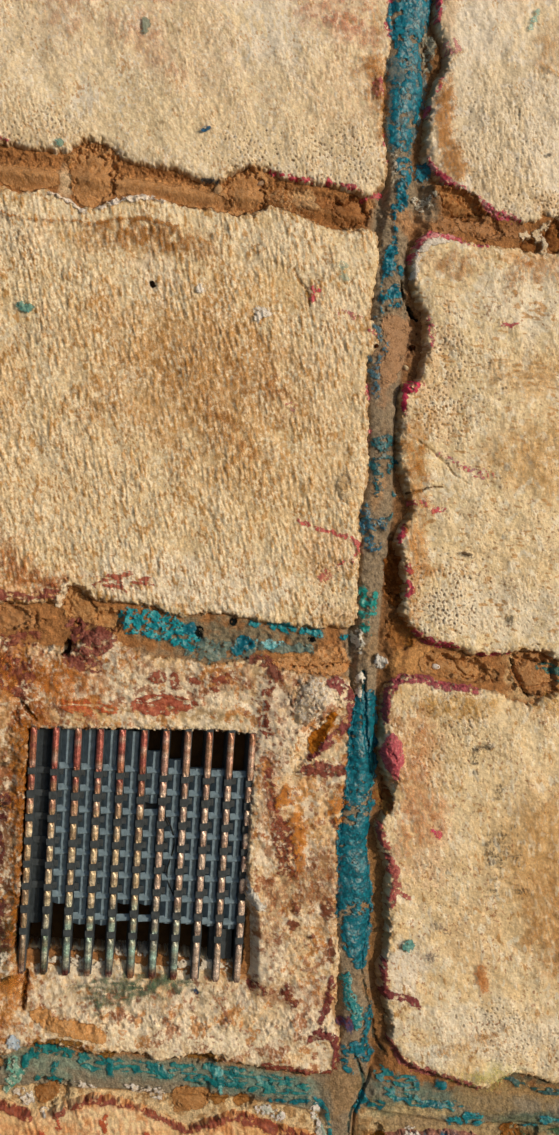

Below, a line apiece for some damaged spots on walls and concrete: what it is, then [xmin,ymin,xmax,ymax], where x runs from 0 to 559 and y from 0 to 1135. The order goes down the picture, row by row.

crack [347,969,386,1132]